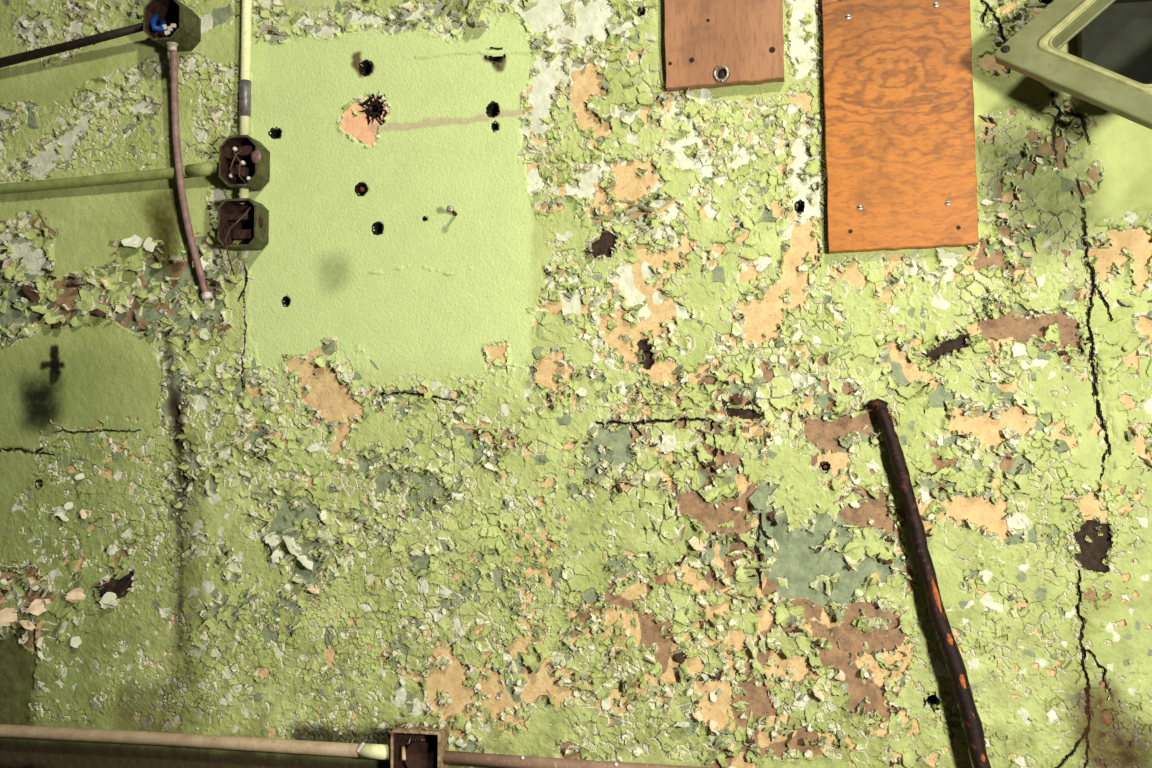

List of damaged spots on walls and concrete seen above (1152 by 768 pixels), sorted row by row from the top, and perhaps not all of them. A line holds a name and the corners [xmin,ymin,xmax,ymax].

peeling [0,0,150,75]
peeling [0,50,254,184]
peeling [785,151,828,224]
flaking render [737,219,826,346]
crack [1077,186,1111,497]
crack [0,429,139,455]
peeling [852,96,1152,768]
flaking render [677,483,760,538]
peeling [759,505,880,608]
flaking render [837,487,899,536]
flaking render [831,601,905,658]
crack [1056,572,1111,768]